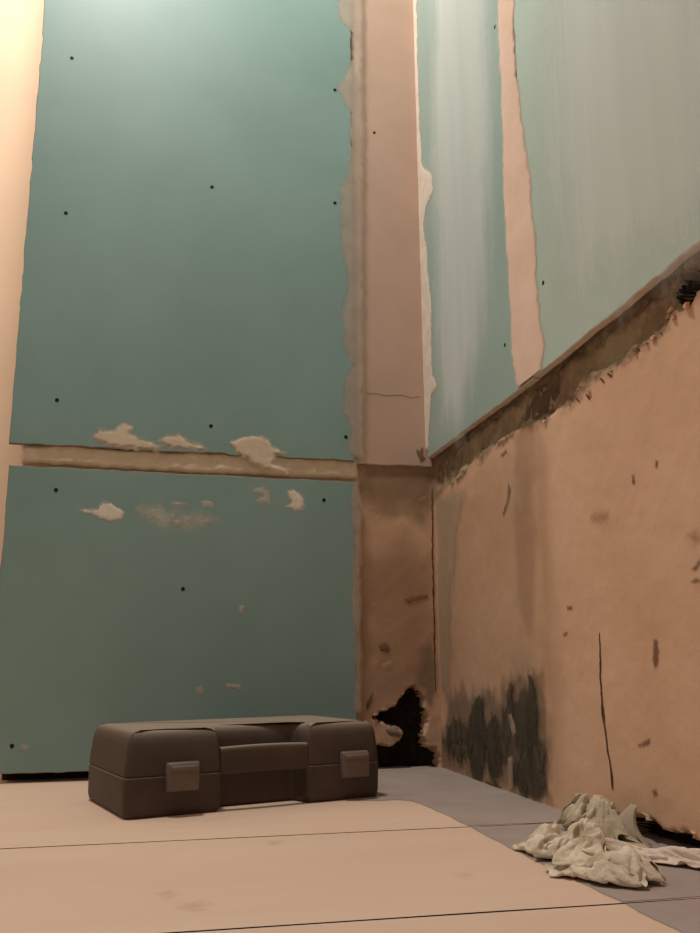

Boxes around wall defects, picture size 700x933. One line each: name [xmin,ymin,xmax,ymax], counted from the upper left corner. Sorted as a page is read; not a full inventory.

flaking render [433,272,700,497]
flaking render [367,688,426,766]
leakage [344,675,568,867]
crack [599,633,613,790]
leakage [567,862,700,933]
leakage [640,832,700,849]